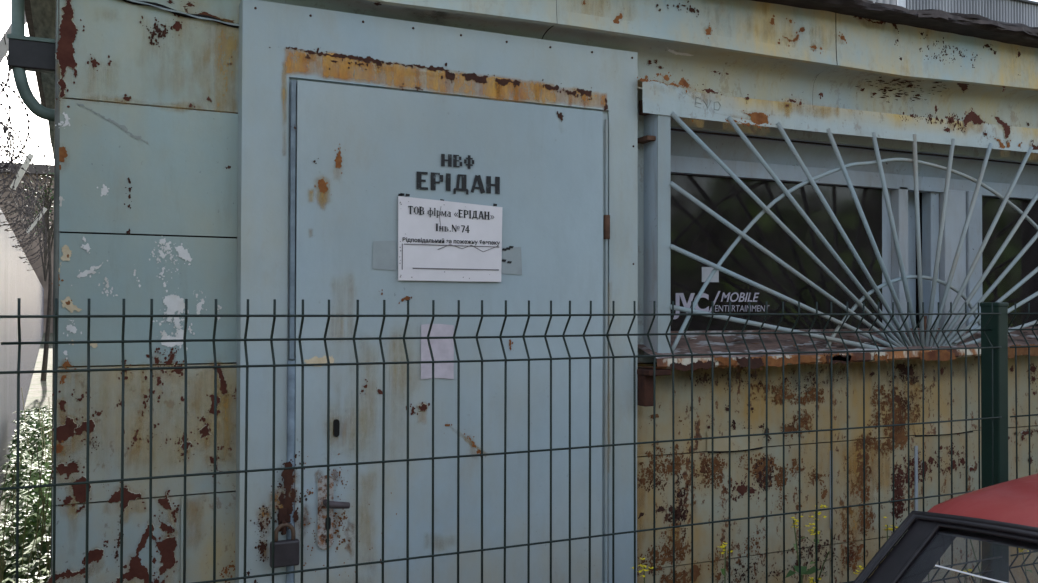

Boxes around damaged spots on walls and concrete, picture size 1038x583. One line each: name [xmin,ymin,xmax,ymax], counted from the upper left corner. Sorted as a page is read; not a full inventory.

rust [286,47,608,122]
rust [855,76,1038,153]
rust [919,32,997,68]
peeling [59,237,118,359]
peeling [149,236,205,351]
rust [46,359,103,513]
rust [46,482,181,583]
rust [118,347,237,478]
rust [250,451,324,572]
rust [329,453,373,552]
rust [637,347,976,583]
rust [1008,344,1038,395]